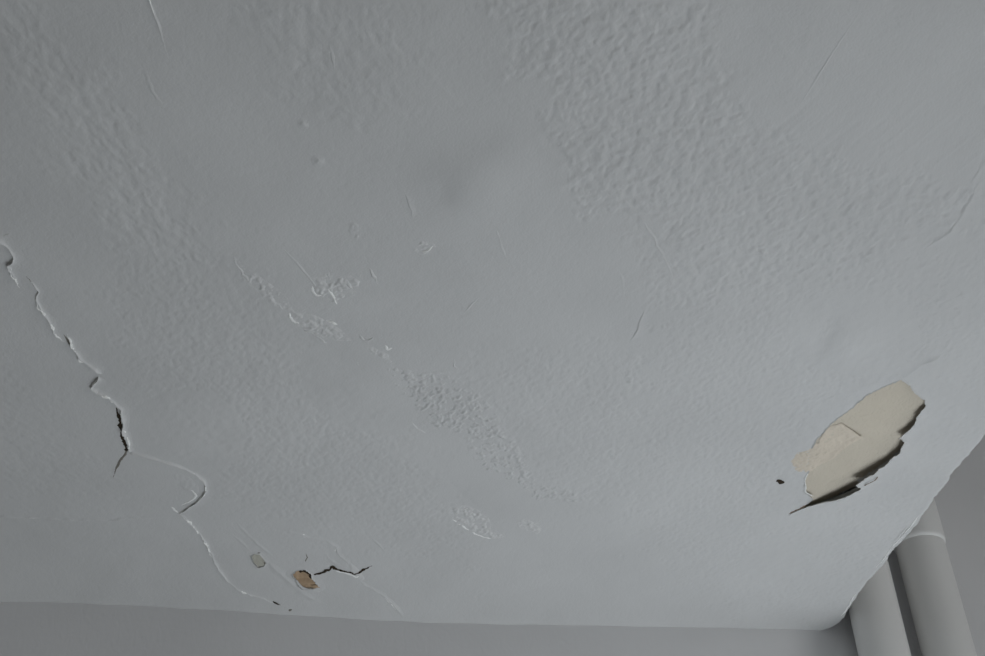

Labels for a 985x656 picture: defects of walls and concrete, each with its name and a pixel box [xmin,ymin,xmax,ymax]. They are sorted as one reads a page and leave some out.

crack [0,226,292,611]
peeling [764,351,954,527]
spalling [286,554,371,593]